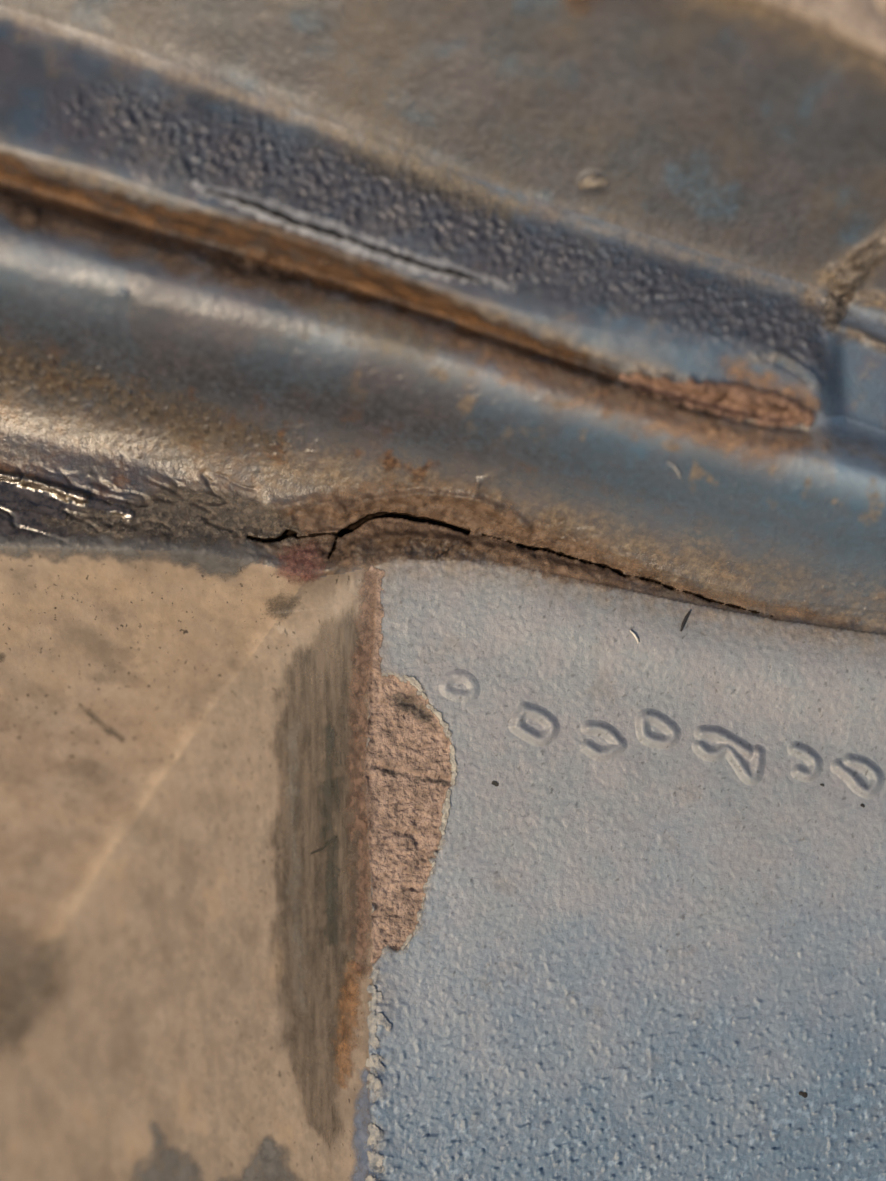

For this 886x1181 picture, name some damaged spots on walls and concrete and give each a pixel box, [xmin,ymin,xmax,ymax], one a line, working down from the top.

corrosion [0,154,818,456]
crack [247,511,773,617]
peeling [362,566,457,1181]